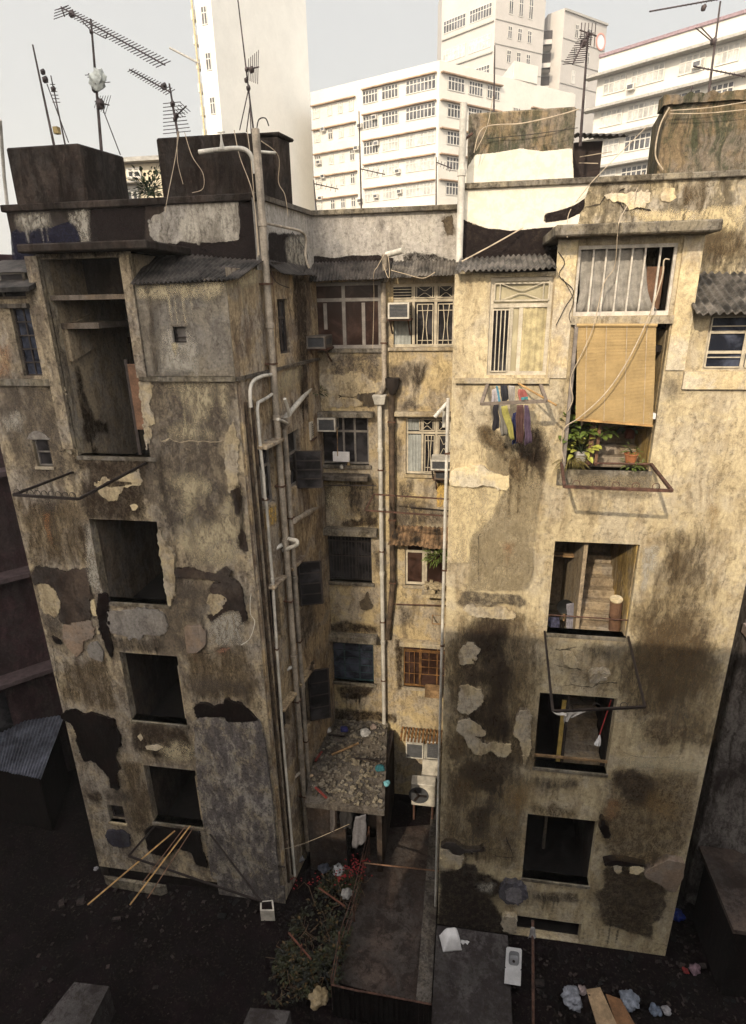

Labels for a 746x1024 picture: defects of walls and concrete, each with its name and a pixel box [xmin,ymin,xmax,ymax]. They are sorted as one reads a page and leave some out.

flaking render [148,202,240,245]
flaking render [604,188,677,210]
leakage [5,269,257,593]
flaking render [94,469,143,501]
leakage [397,424,546,562]
flaking render [449,465,509,491]
flaking render [30,565,114,659]
flaking render [157,527,248,623]
flaking render [61,708,122,791]
flaking render [192,697,258,723]
flaking render [456,683,532,766]
leakage [585,528,718,944]